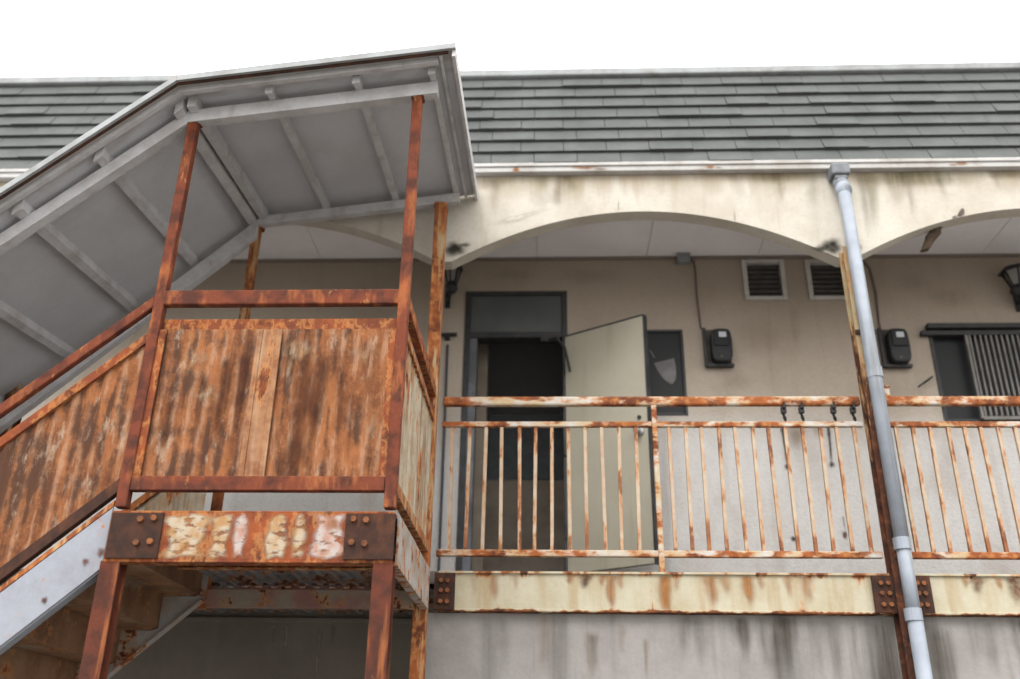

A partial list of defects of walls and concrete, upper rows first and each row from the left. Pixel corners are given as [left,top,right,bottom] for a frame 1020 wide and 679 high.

rust [215,355,247,423]
rust [296,360,325,422]
rust [288,439,301,464]
peeling [164,514,248,558]
peeling [265,514,344,558]
rust [661,577,669,608]
rust [744,577,752,597]
water stain [932,633,945,679]